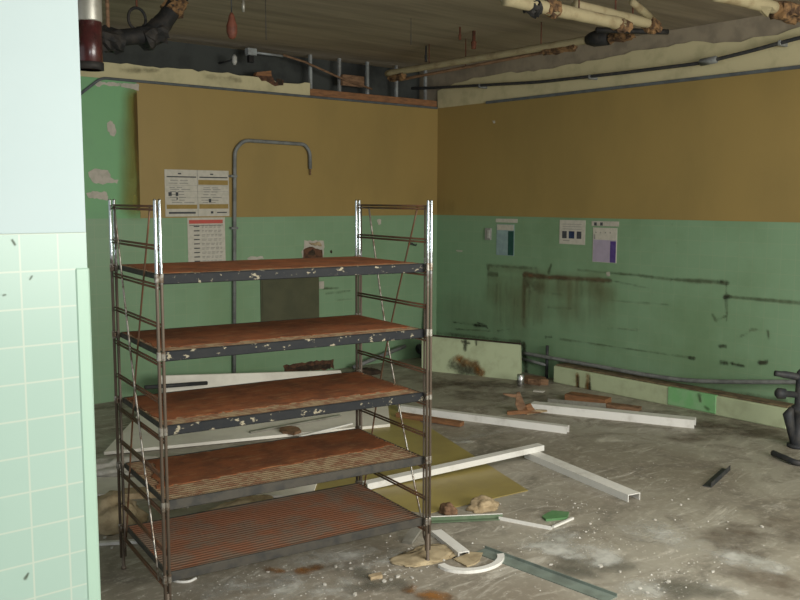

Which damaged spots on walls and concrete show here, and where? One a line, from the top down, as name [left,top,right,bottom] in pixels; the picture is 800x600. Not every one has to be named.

peeling [86,169,118,201]
rust [523,272,610,287]